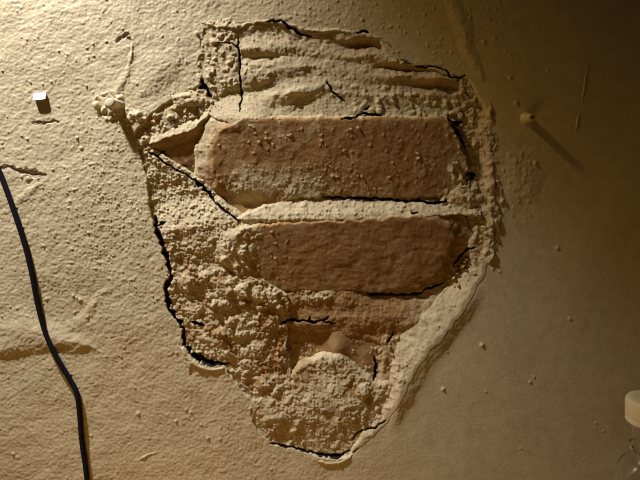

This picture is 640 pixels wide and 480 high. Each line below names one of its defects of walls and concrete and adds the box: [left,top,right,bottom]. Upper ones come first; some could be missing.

crack [267,20,311,37]
crack [218,37,243,112]
crack [415,66,465,79]
crack [327,82,382,120]
crack [149,151,240,221]
crack [322,196,447,214]
spalling [135,17,504,466]
crack [454,247,475,264]
crack [154,215,230,367]
crack [367,282,444,296]
crack [270,420,386,459]